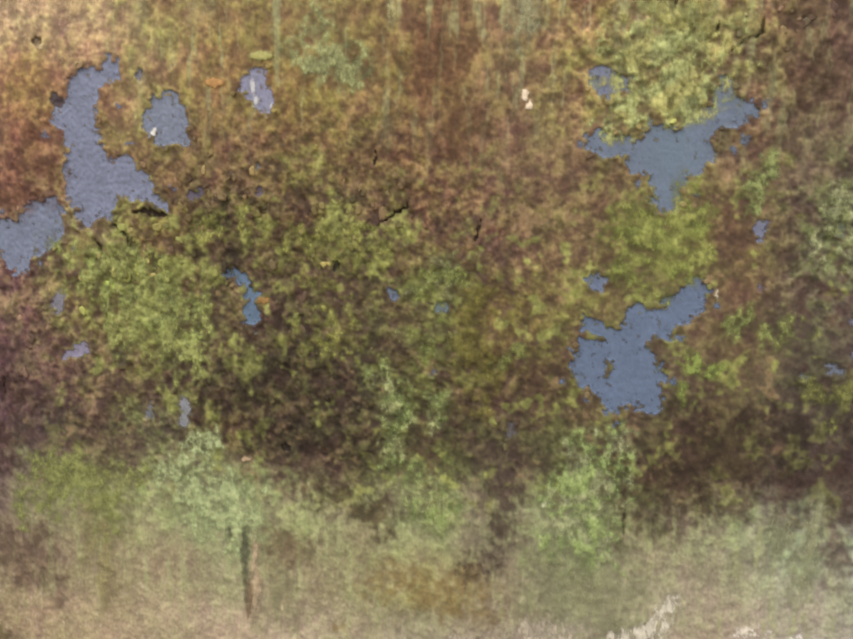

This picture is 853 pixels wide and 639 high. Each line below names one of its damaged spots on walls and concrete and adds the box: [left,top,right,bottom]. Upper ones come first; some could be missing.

peeling [231,51,277,113]
peeling [0,53,271,290]
peeling [578,75,769,214]
peeling [293,179,389,252]
peeling [211,260,278,333]
peeling [583,272,608,293]
peeling [559,276,720,427]
mould [313,483,392,540]
water stain [488,442,524,541]
efflorescence [733,625,772,639]